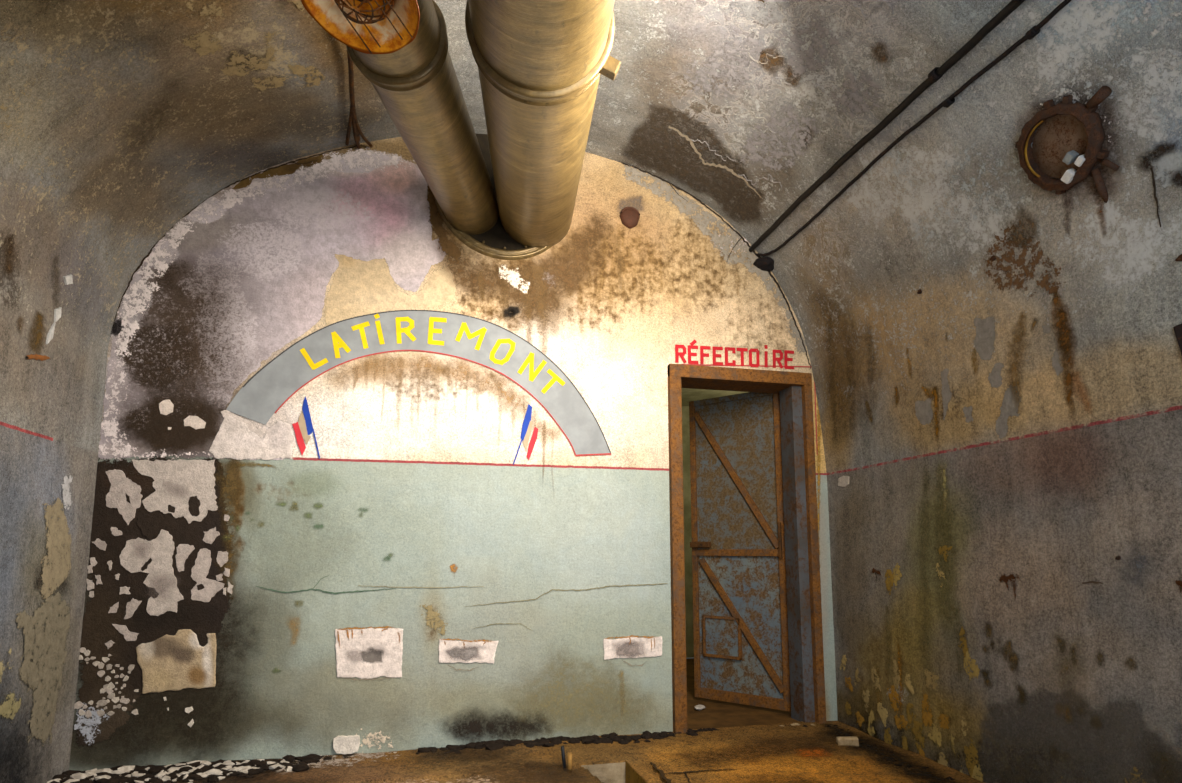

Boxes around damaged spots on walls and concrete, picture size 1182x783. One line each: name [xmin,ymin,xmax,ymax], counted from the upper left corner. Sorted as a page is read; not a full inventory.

crack [615,160,811,369]
damp [18,312,44,351]
corrosion [983,227,1089,408]
damp [414,357,526,410]
peeling [0,152,465,747]
damp [216,461,273,585]
damp [278,502,323,528]
crack [257,575,668,631]
damp [958,624,1018,686]
damp [840,639,1182,783]
flaking render [333,735,360,754]